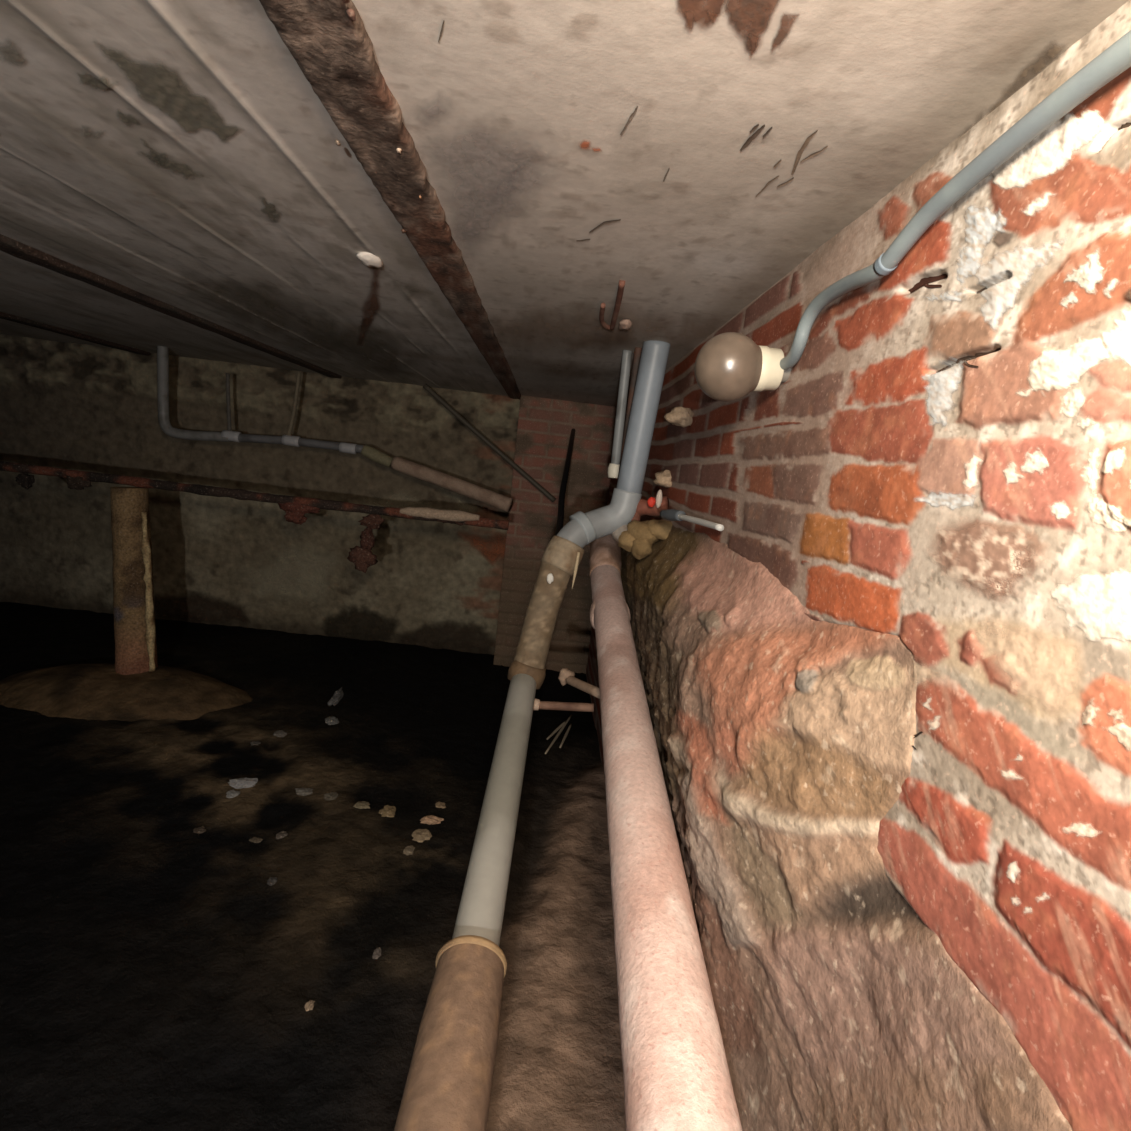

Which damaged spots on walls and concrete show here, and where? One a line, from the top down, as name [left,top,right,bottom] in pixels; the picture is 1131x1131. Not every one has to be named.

damp [991,43,1062,112]
corrosion [359,267,379,344]